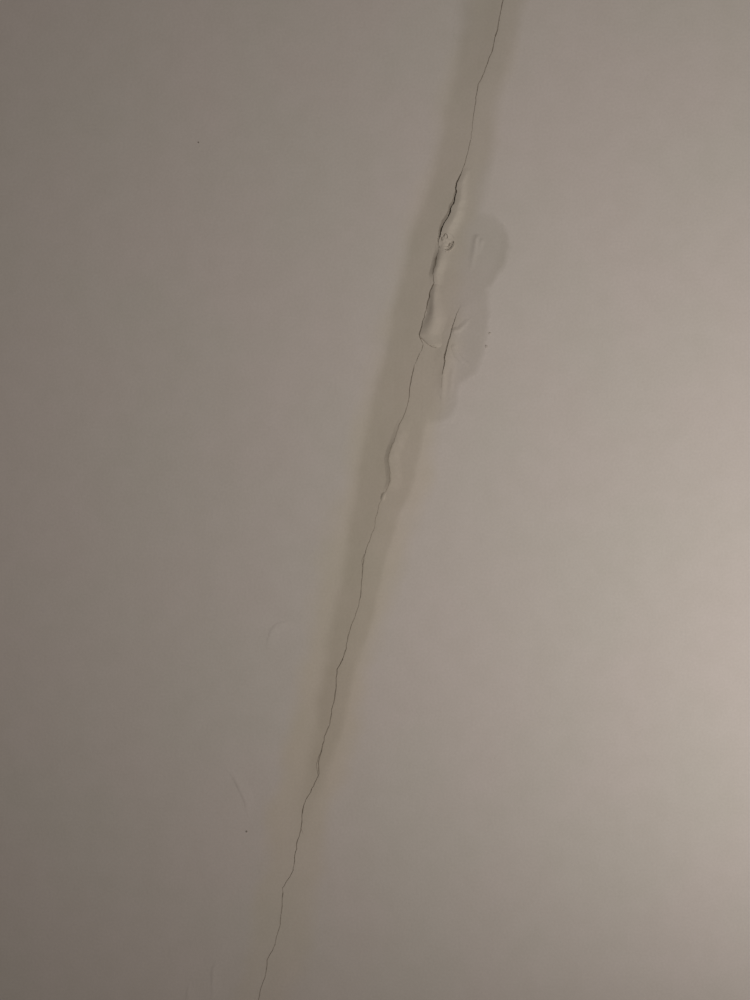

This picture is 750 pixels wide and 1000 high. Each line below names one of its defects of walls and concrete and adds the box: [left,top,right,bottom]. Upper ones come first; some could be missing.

crack [258,1,503,1000]